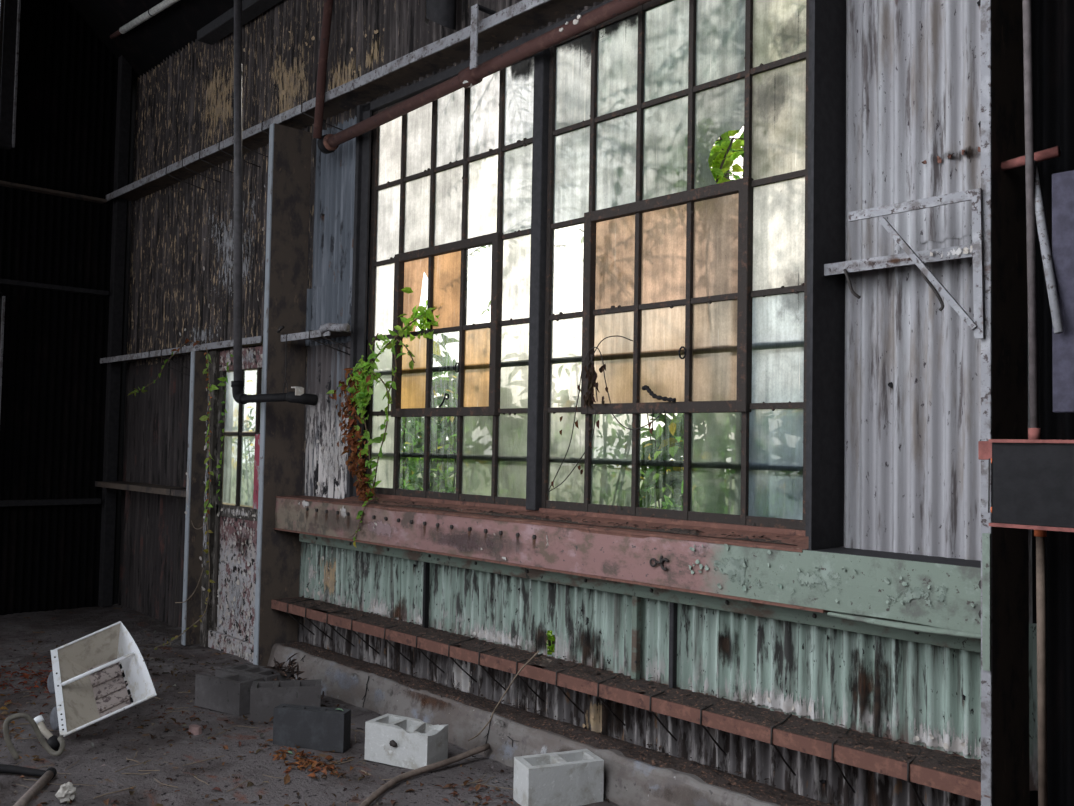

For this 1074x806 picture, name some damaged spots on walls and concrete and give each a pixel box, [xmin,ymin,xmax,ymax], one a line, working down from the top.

peeling [316,417,348,491]